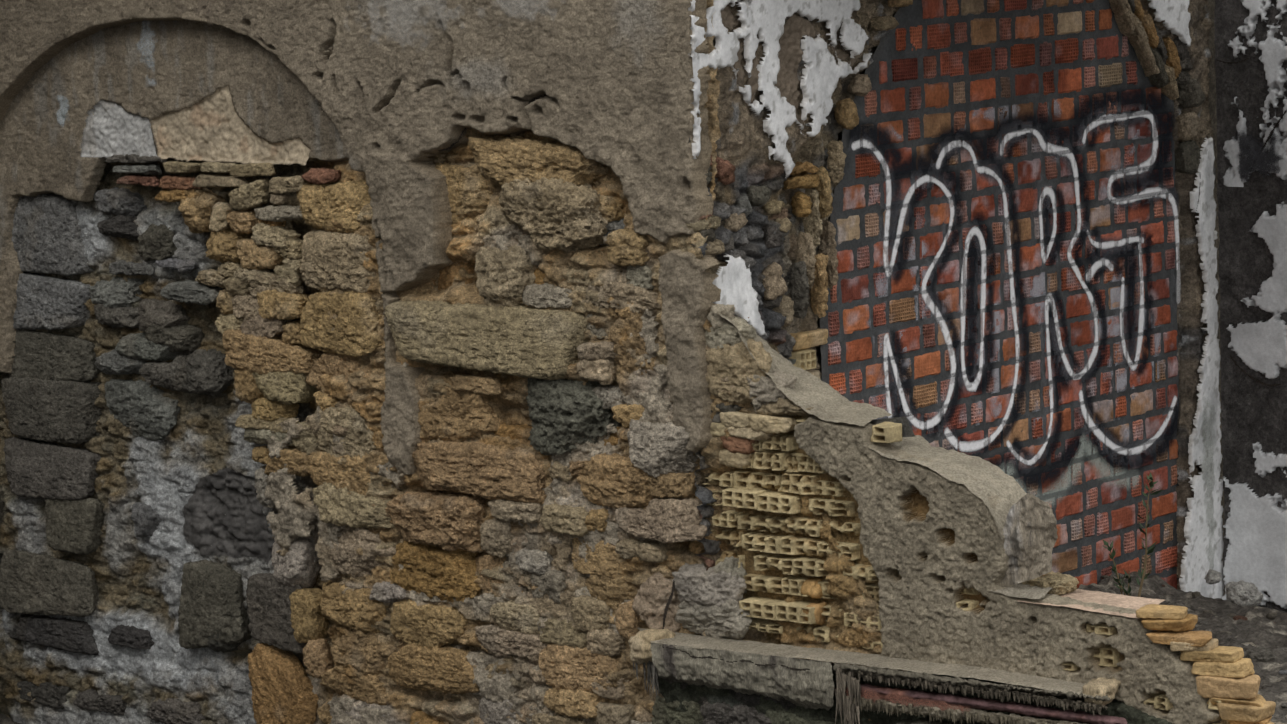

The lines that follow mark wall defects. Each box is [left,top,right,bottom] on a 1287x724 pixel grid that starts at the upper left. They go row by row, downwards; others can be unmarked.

peeling [721,0,863,134]
spalling [81,86,311,165]
flaking render [1214,0,1287,595]
peeling [182,467,275,565]
flaking render [1257,591,1287,613]
rust [834,683,1127,724]